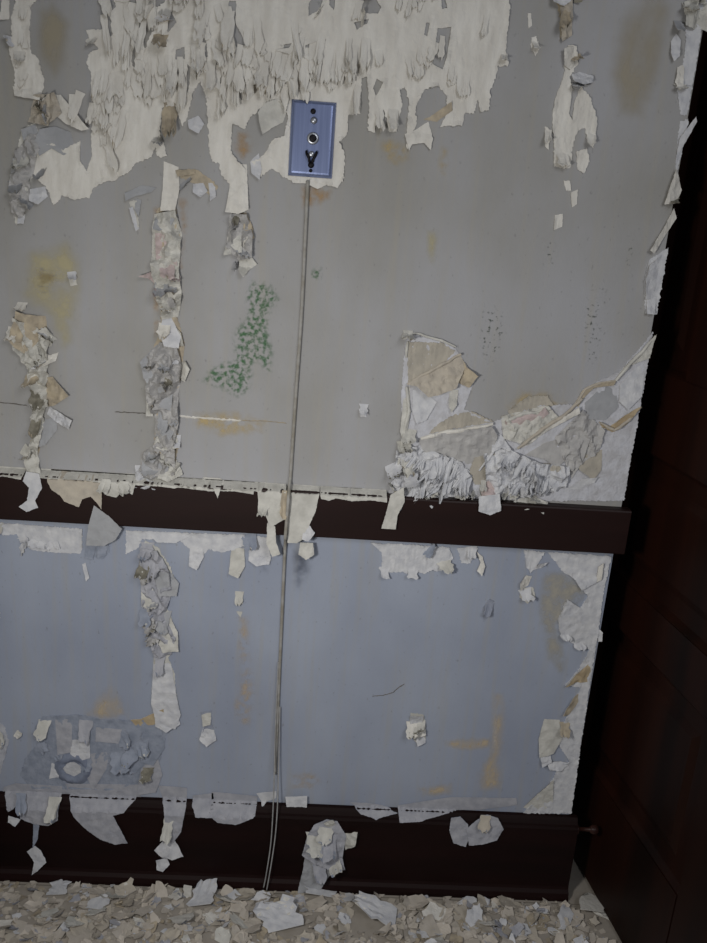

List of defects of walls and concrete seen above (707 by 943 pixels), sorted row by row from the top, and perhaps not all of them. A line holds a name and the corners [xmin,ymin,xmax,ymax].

peeling [0,0,510,277]
peeling [527,13,541,56]
peeling [544,0,597,207]
peeling [644,0,707,315]
water stain [212,286,273,390]
peeling [0,162,657,875]
peeling [298,819,358,893]